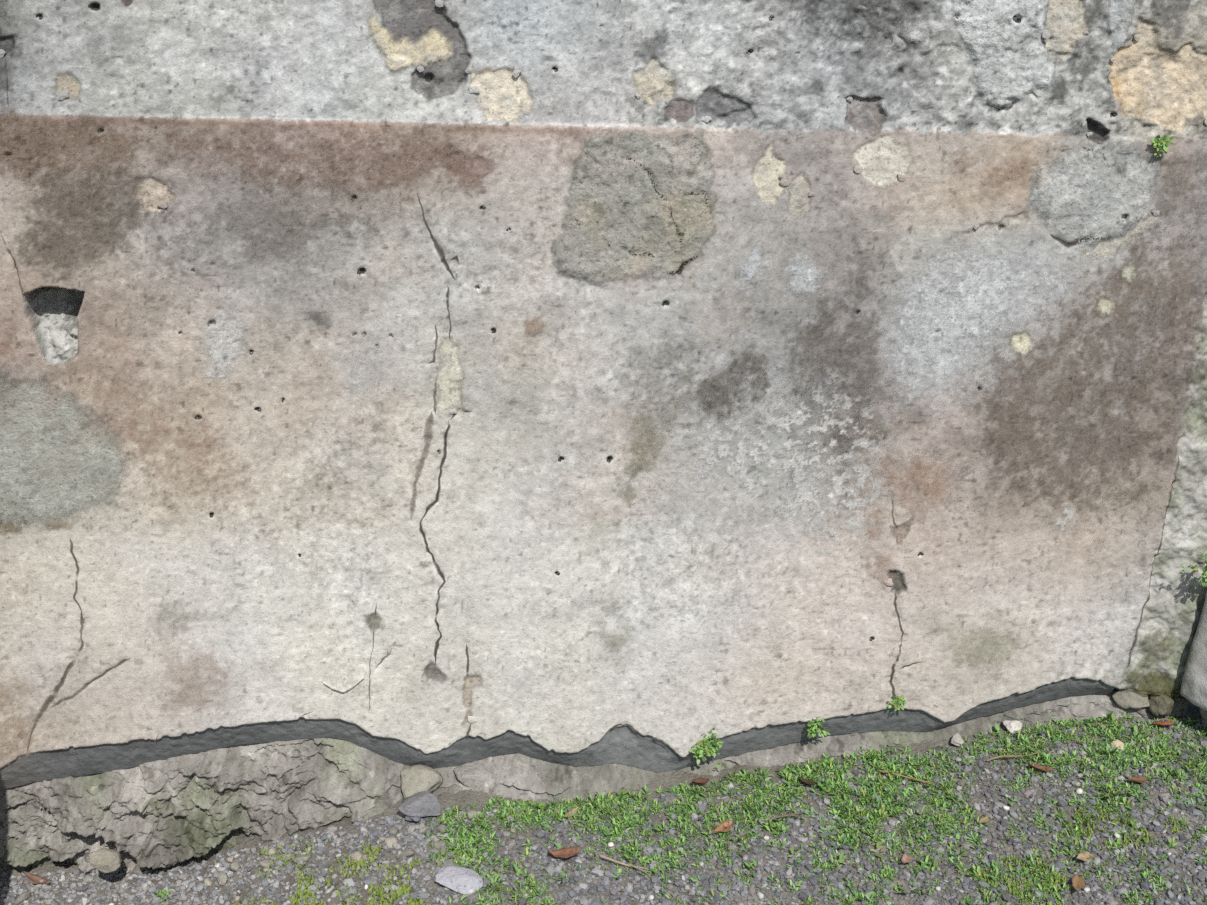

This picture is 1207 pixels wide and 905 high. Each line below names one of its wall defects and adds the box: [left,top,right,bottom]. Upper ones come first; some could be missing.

spalling [369,0,534,122]
spalling [1108,18,1207,131]
damp [23,174,141,275]
spalling [1082,210,1160,258]
crack [410,193,470,677]
damp [896,239,1204,530]
crack [1127,454,1180,668]
crack [27,538,130,751]
crack [890,593,919,695]